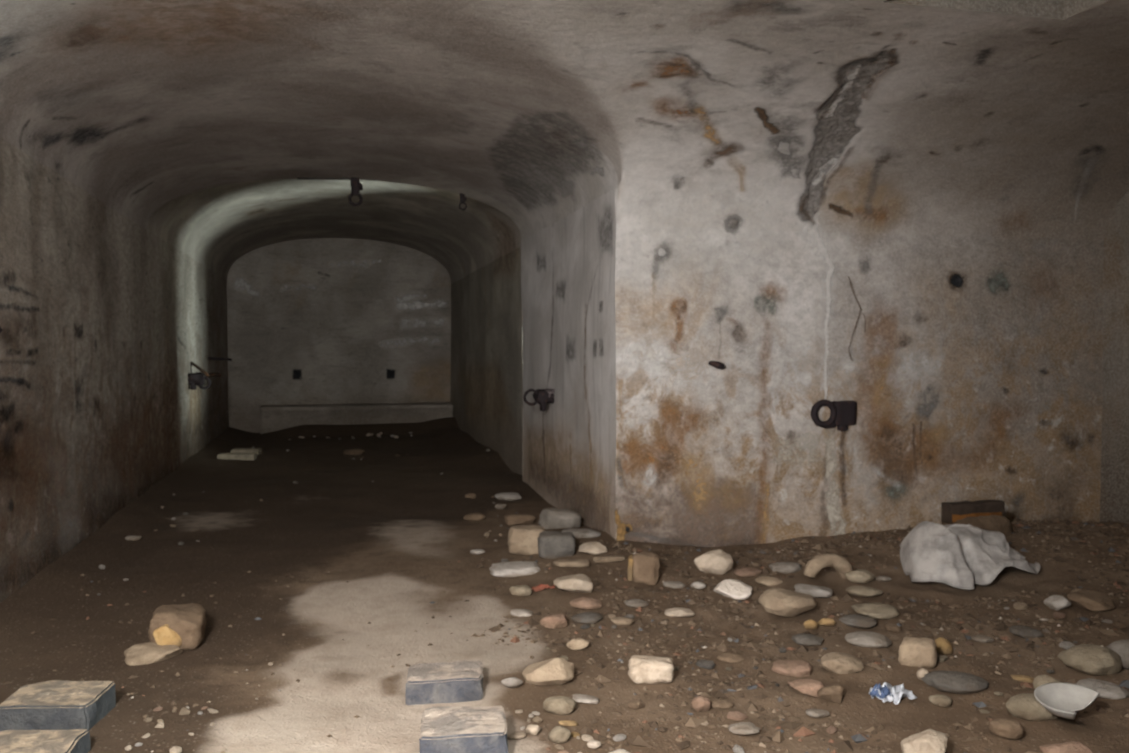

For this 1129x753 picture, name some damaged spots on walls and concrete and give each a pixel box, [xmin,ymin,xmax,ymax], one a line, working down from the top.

corrosion [657,52,707,78]
corrosion [660,102,738,164]
spalling [755,46,898,226]